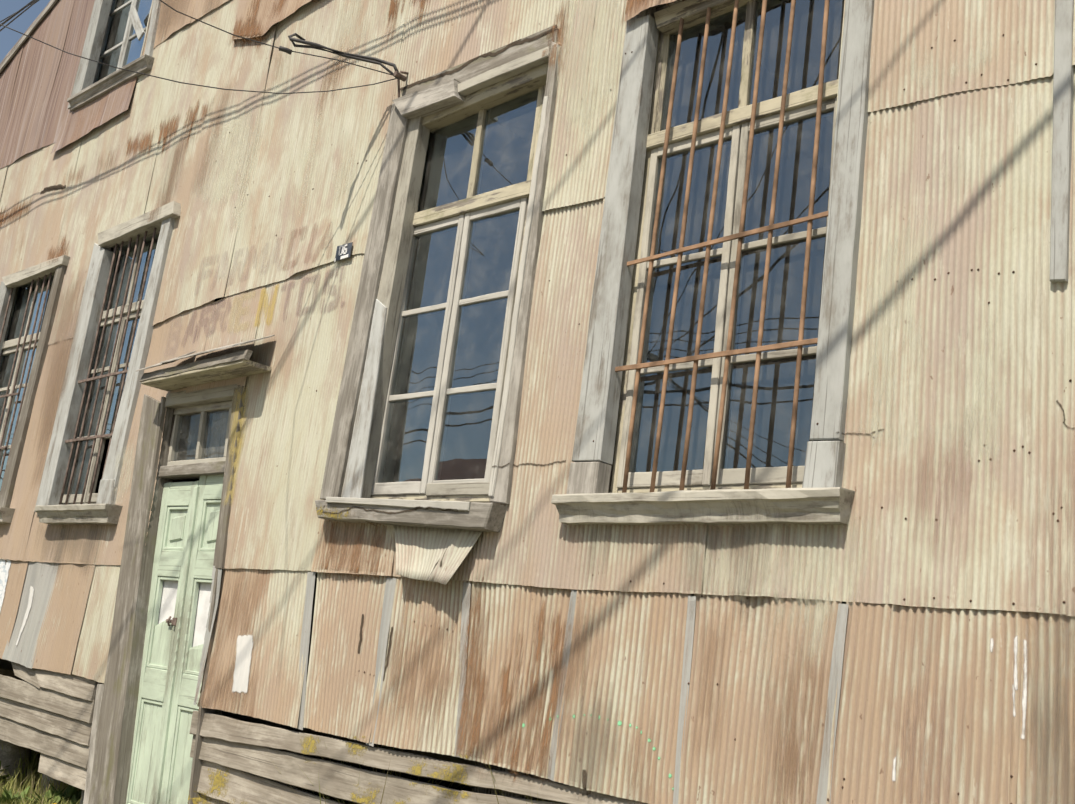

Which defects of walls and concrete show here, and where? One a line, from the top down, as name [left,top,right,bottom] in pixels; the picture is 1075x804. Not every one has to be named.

rust [233,0,266,48]
rust [389,0,428,22]
rust [127,100,208,154]
crack [492,460,566,468]
rust [456,599,485,755]
rust [494,609,565,779]